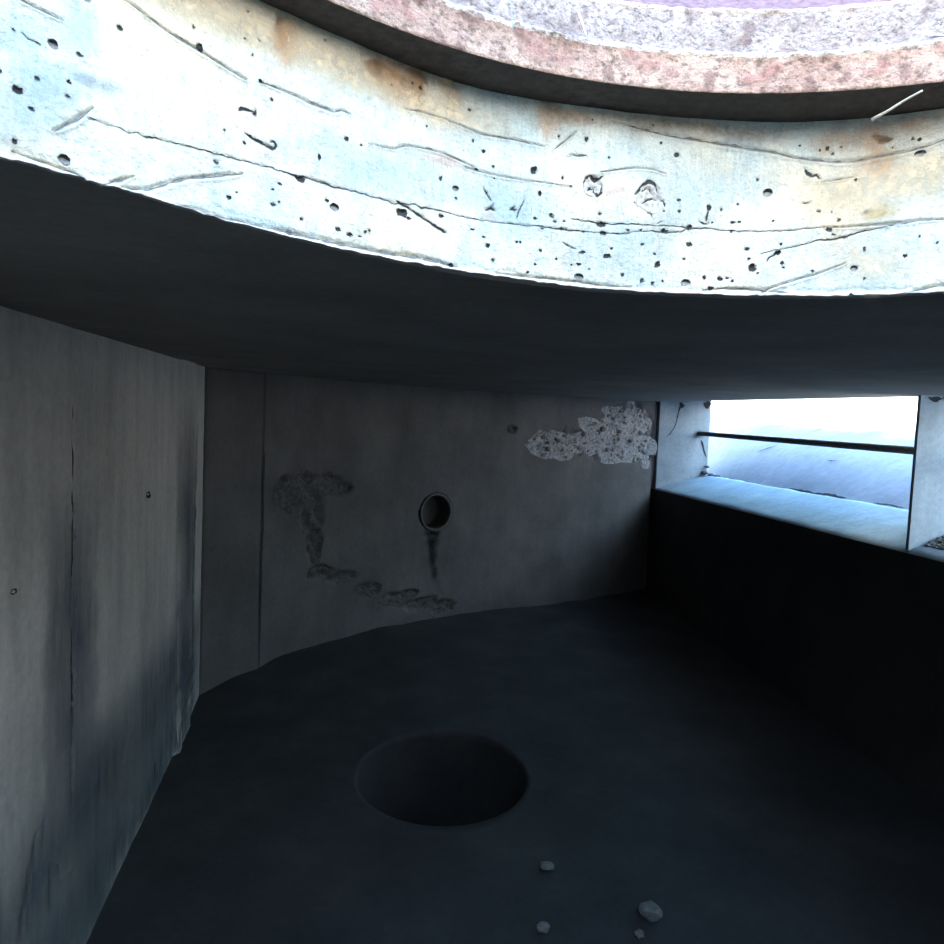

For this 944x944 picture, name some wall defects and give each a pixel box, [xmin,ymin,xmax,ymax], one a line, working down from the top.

crack [89,117,909,254]
spalling [583,174,603,197]
spalling [634,179,665,217]
spalling [525,401,657,469]